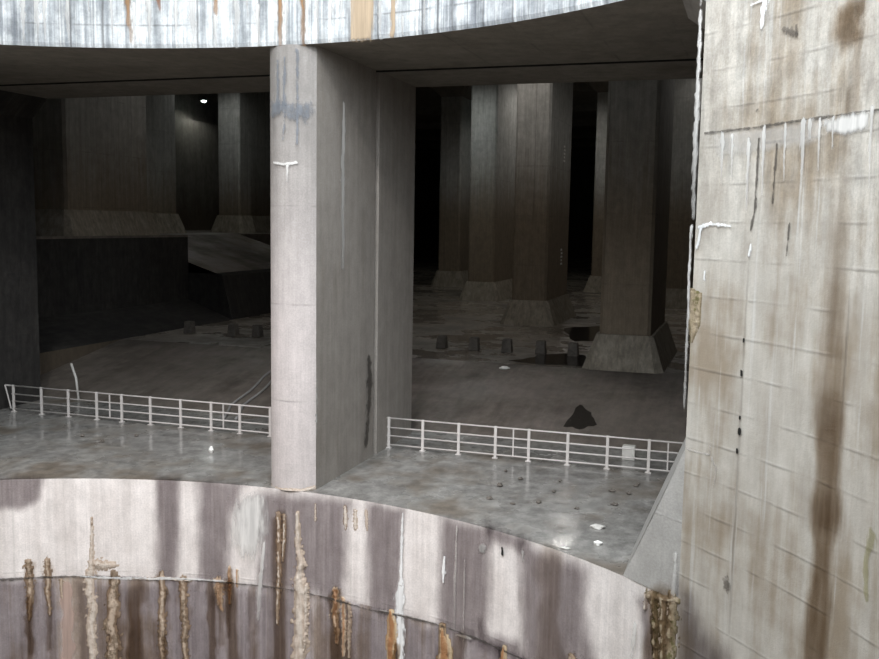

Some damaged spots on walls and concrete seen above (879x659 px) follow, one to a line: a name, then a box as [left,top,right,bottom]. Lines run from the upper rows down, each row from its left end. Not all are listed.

corrosion [351,0,373,41]
water stain [342,505,369,531]
water stain [22,555,65,622]
water stain [83,517,239,659]
water stain [232,495,311,659]
water stain [329,586,353,658]
water stain [382,513,421,659]
water stain [643,588,682,659]